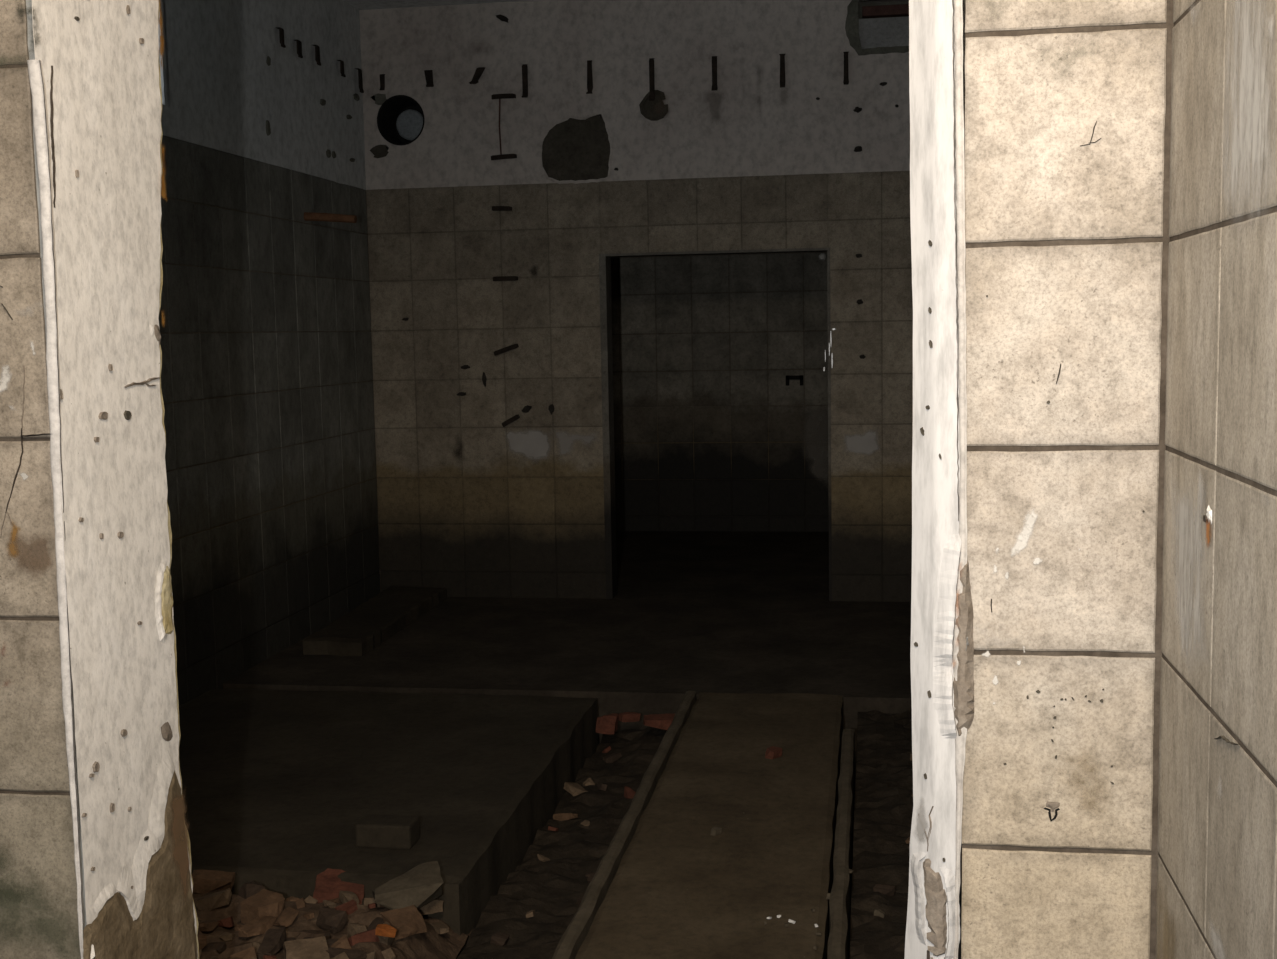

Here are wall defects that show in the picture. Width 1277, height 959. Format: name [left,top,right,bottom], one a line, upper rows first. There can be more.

flaking render [540,112,613,184]
spalling [149,223,166,450]
crack [1,365,50,535]
corrosion [9,525,49,570]
peeling [927,534,990,739]
peeling [83,503,199,959]
peeling [911,851,960,959]